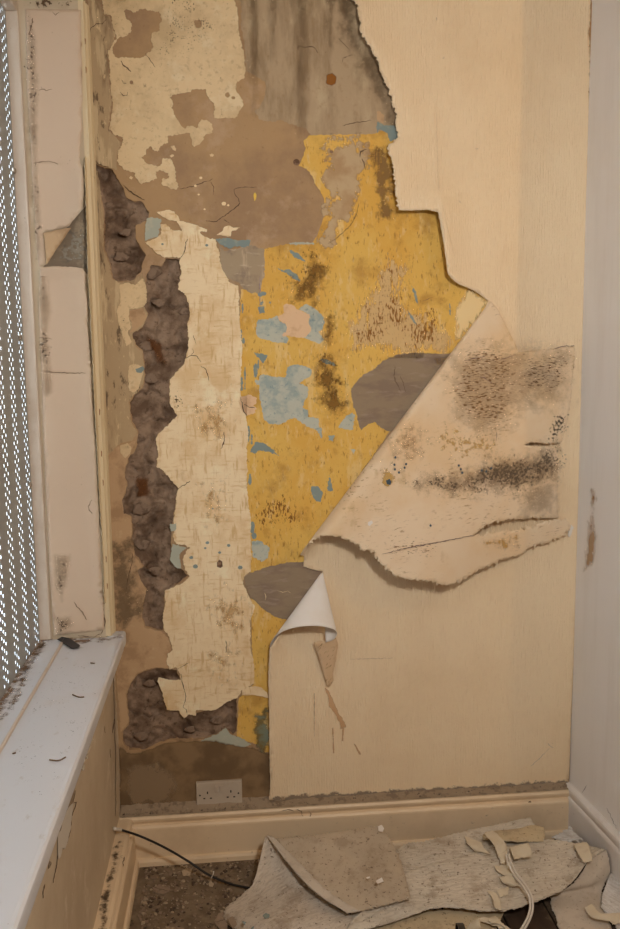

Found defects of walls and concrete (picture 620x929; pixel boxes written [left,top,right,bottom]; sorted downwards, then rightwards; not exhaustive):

peeling [316,133,371,249]
peeling [44,0,246,630]
peeling [278,304,311,338]
peeling [308,256,575,586]
damp [404,348,571,495]
peeling [256,495,303,527]
peeling [269,573,338,687]
flaking render [113,668,269,816]